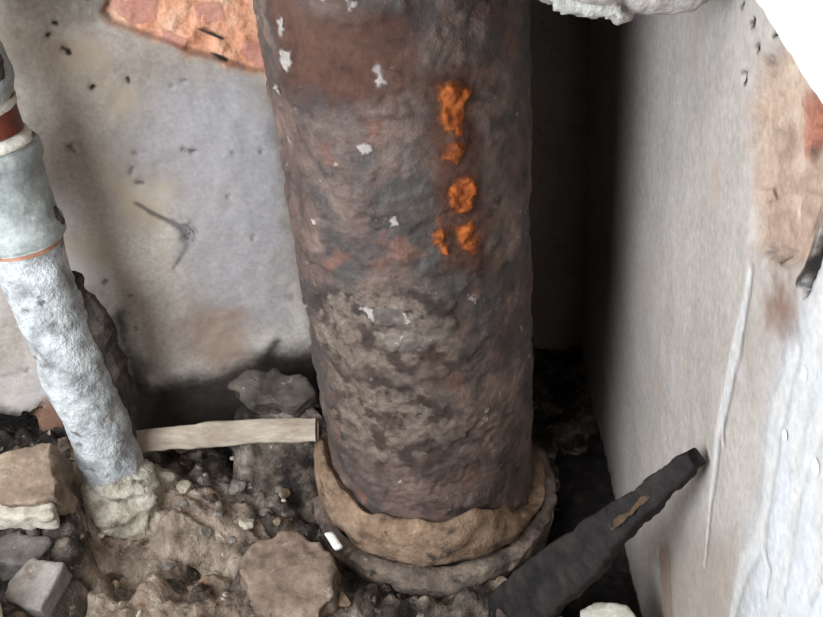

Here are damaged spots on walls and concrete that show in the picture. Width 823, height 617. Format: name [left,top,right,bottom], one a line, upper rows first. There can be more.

spalling [103,0,265,73]
crack [136,203,195,264]
rust [432,71,485,269]
spalling [752,44,823,265]